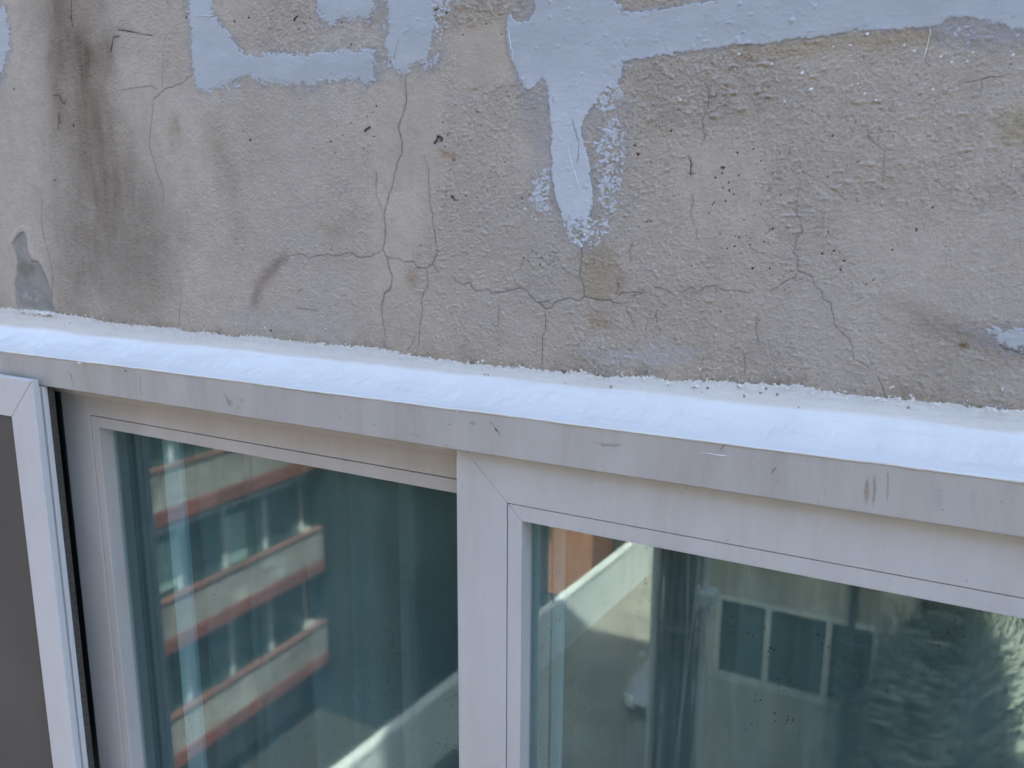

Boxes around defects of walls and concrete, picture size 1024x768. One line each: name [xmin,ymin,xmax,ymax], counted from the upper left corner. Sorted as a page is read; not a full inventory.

crack [121,73,192,197]
peeling [12,231,54,312]
crack [287,40,885,396]